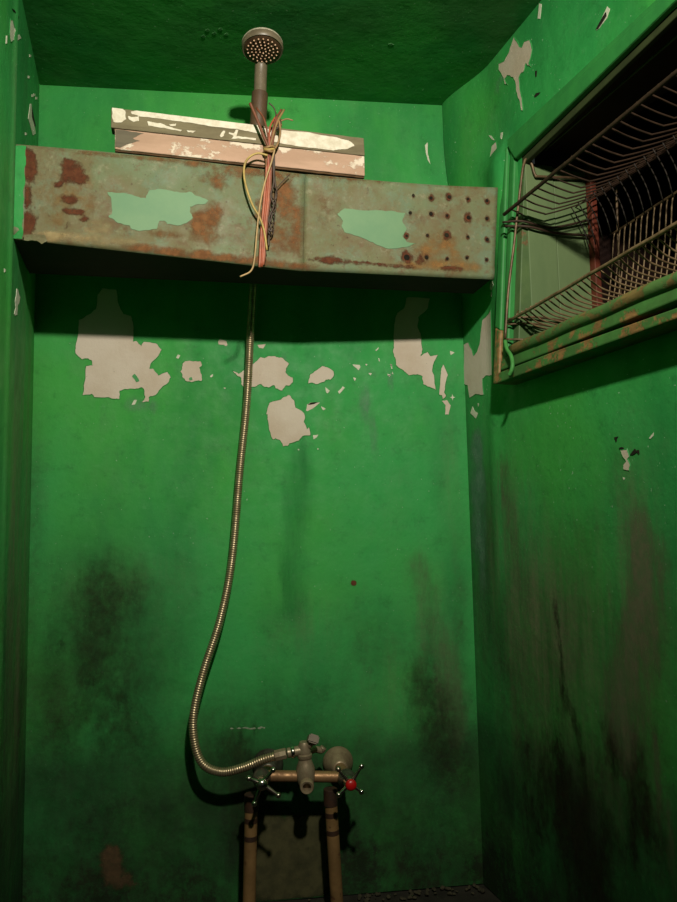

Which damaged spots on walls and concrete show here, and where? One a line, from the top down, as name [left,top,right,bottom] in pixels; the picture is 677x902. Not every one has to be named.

peeling [498,37,537,111]
peeling [75,288,213,405]
peeling [233,344,325,451]
peeling [308,365,344,394]
peeling [375,297,455,415]
peeling [450,310,493,418]
spalling [614,437,640,480]